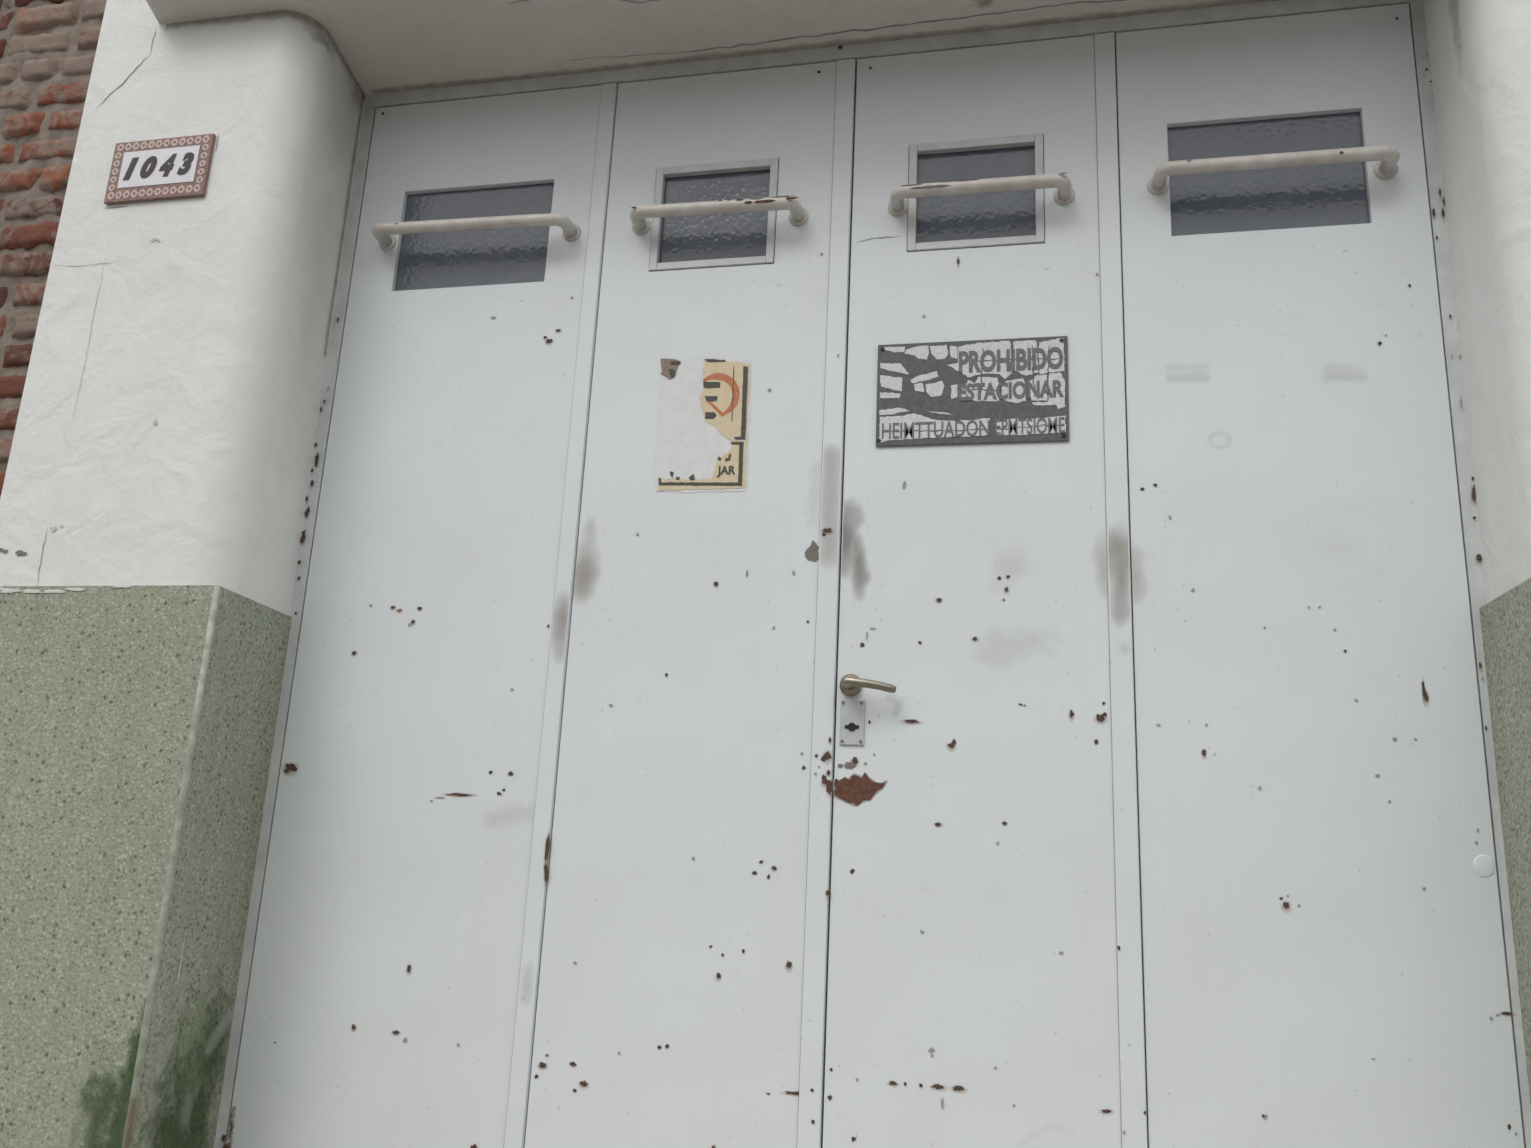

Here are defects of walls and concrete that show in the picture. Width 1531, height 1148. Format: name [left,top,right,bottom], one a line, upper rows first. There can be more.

crack [578,0,1125,60]
rust [825,772,888,806]
rust [221,1108,235,1148]